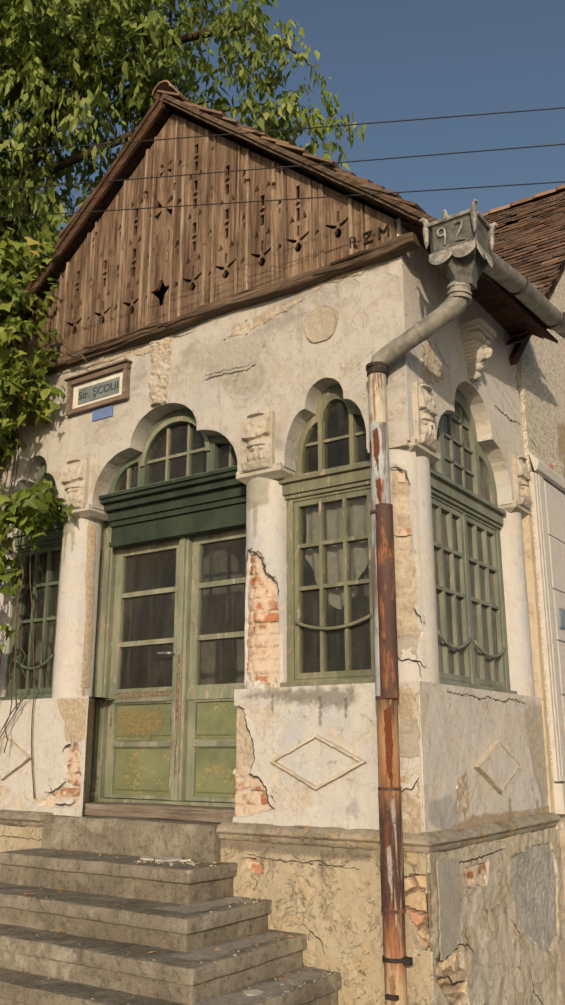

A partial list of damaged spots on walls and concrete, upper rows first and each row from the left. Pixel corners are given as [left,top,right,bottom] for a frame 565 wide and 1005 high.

flaking render [390,467,421,643]
flaking render [245,549,280,688]
peeling [41,522,104,807]
flaking render [233,709,273,816]
corrosion [384,707,393,787]
crack [246,853,361,890]
crack [300,918,330,955]
flaking render [404,874,432,947]
flaking render [436,946,468,1005]